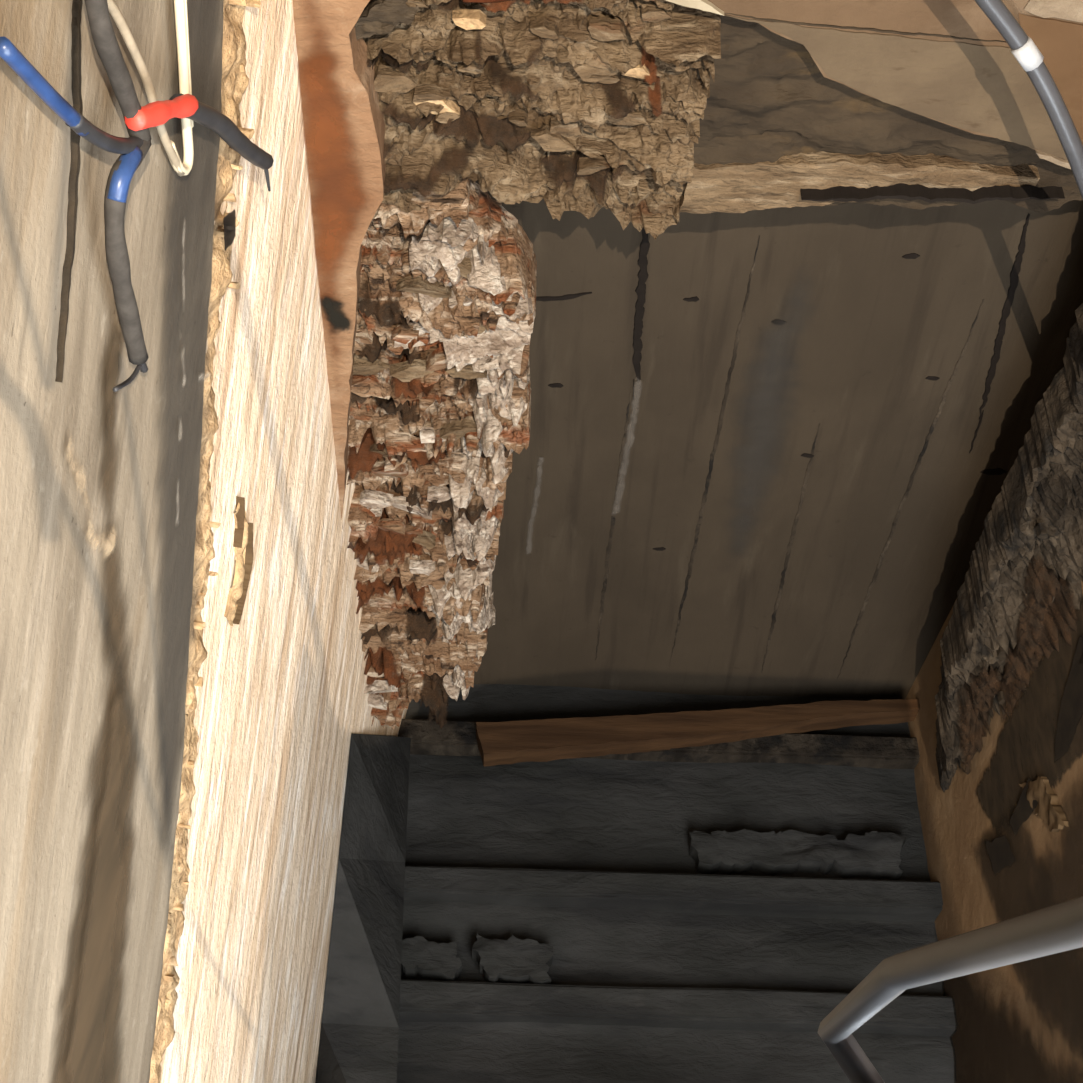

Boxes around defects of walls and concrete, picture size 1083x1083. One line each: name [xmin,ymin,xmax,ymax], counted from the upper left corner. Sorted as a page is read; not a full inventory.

spalling [347,0,1083,793]
peeling [224,496,253,627]
spalling [985,776,1070,874]